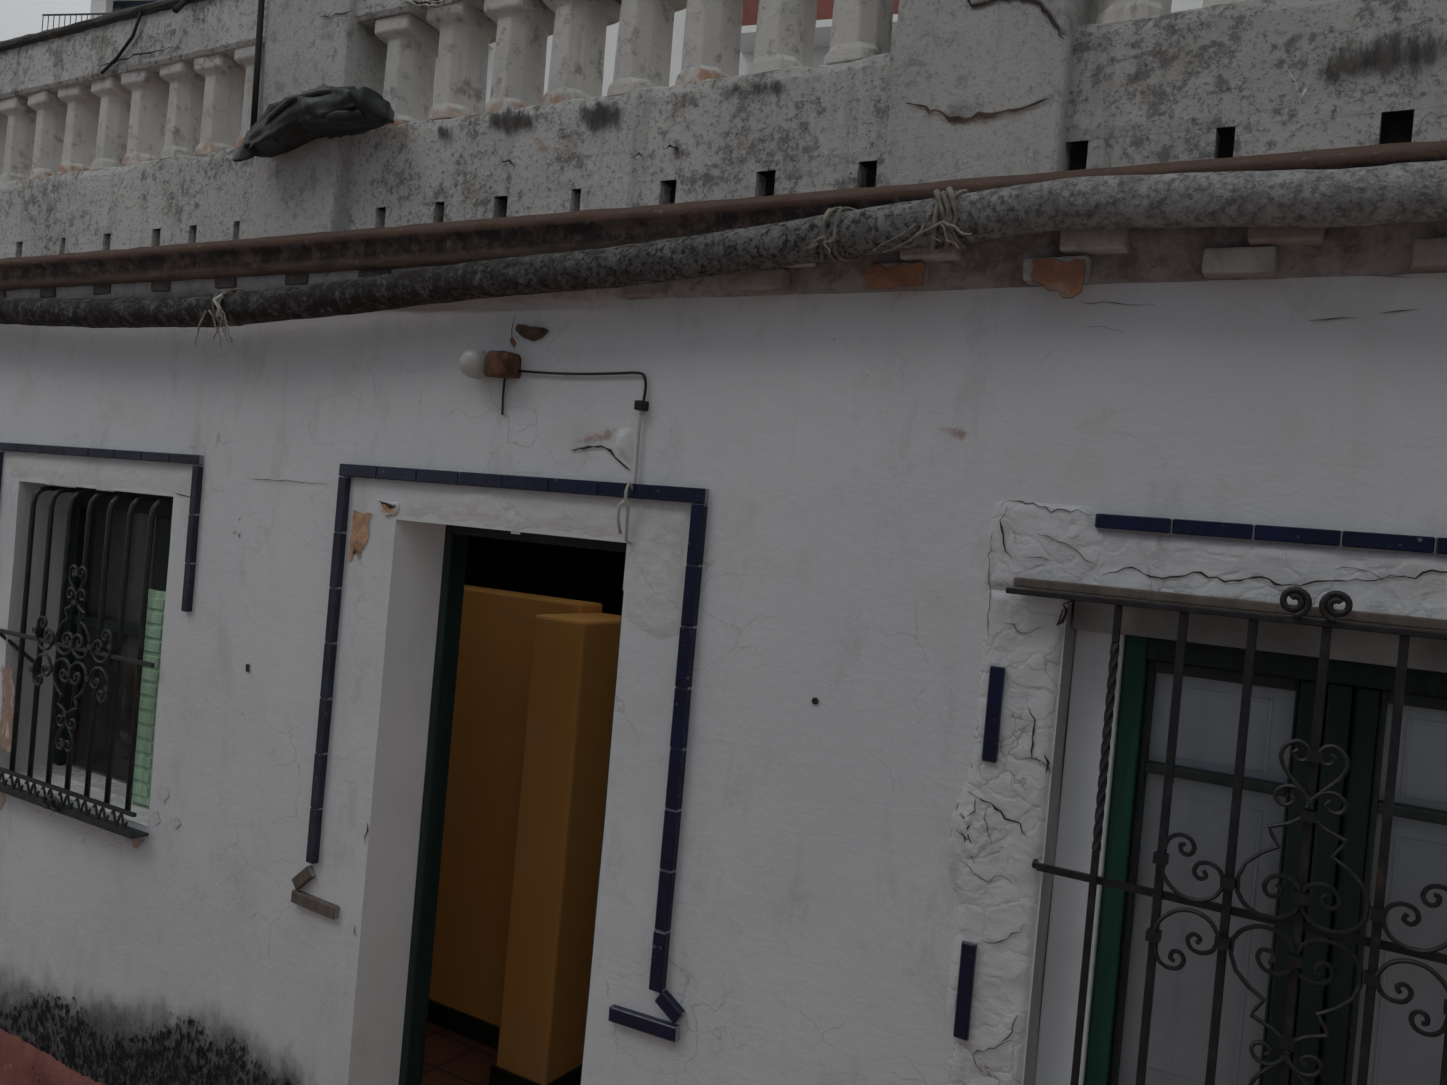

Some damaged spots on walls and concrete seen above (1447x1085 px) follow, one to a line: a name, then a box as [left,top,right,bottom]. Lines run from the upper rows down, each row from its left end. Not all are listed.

crack [906,98,1048,123]
peeling [348,499,400,561]
crack [987,500,1447,636]
spalling [0,667,15,754]
crack [1023,706,1051,774]
crack [951,764,1027,886]
crack [983,924,1027,944]
leakage [0,986,300,1085]
crack [959,1015,1018,1084]